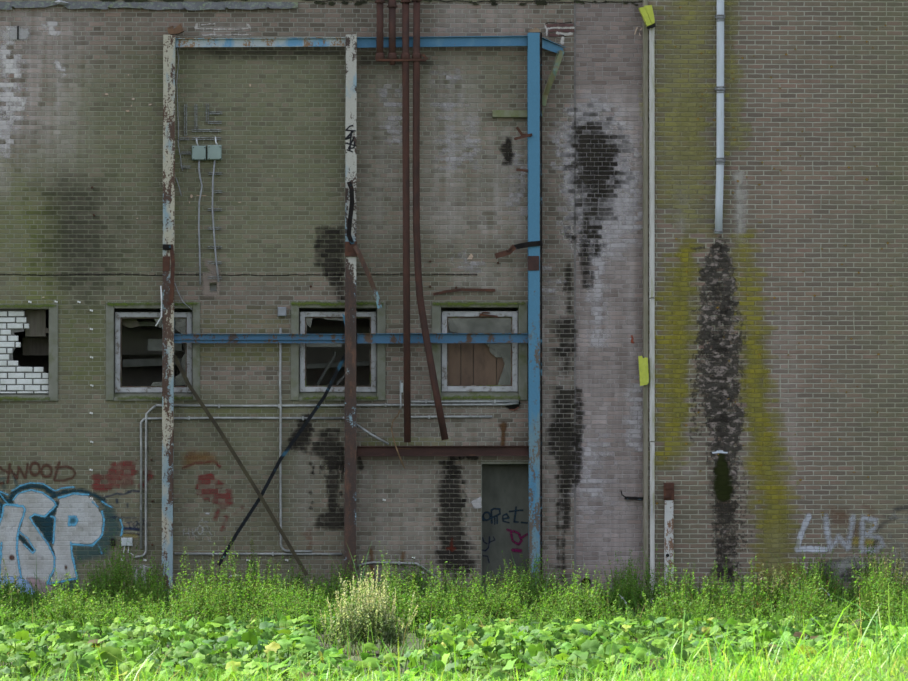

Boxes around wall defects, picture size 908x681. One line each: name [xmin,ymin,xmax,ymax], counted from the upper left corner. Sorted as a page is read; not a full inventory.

water stain [42,21,62,36]
water stain [0,26,27,158]
water stain [314,227,345,300]
water stain [552,97,643,370]
water stain [626,384,643,451]
water stain [671,171,787,586]
water stain [309,428,344,530]
water stain [435,457,474,578]
water stain [547,387,609,583]